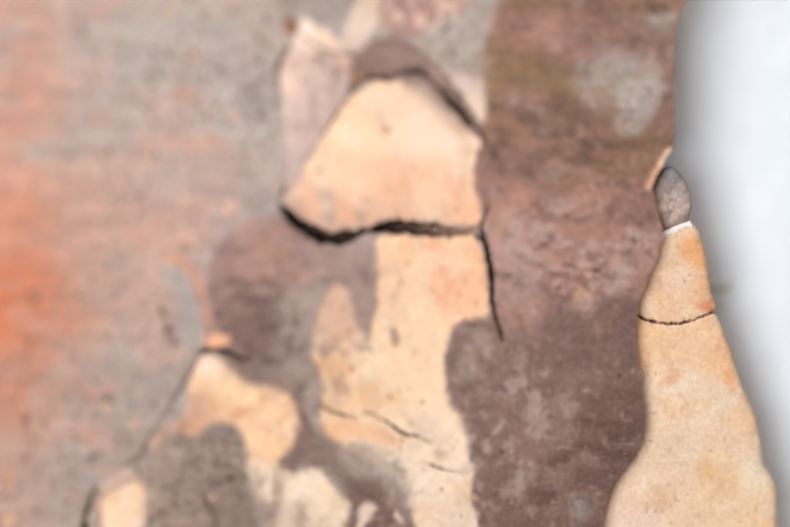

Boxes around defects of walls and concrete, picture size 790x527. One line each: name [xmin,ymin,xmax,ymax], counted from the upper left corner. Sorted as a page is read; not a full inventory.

water stain [270,0,360,28]
water stain [284,48,351,165]
crack [312,69,489,150]
crack [167,348,248,414]
spalling [146,257,379,527]
water stain [138,166,420,527]
crack [320,403,430,443]
spalling [276,0,493,527]
crack [279,185,504,341]
water stain [380,0,686,527]
crack [638,312,713,325]
crack [82,488,98,527]